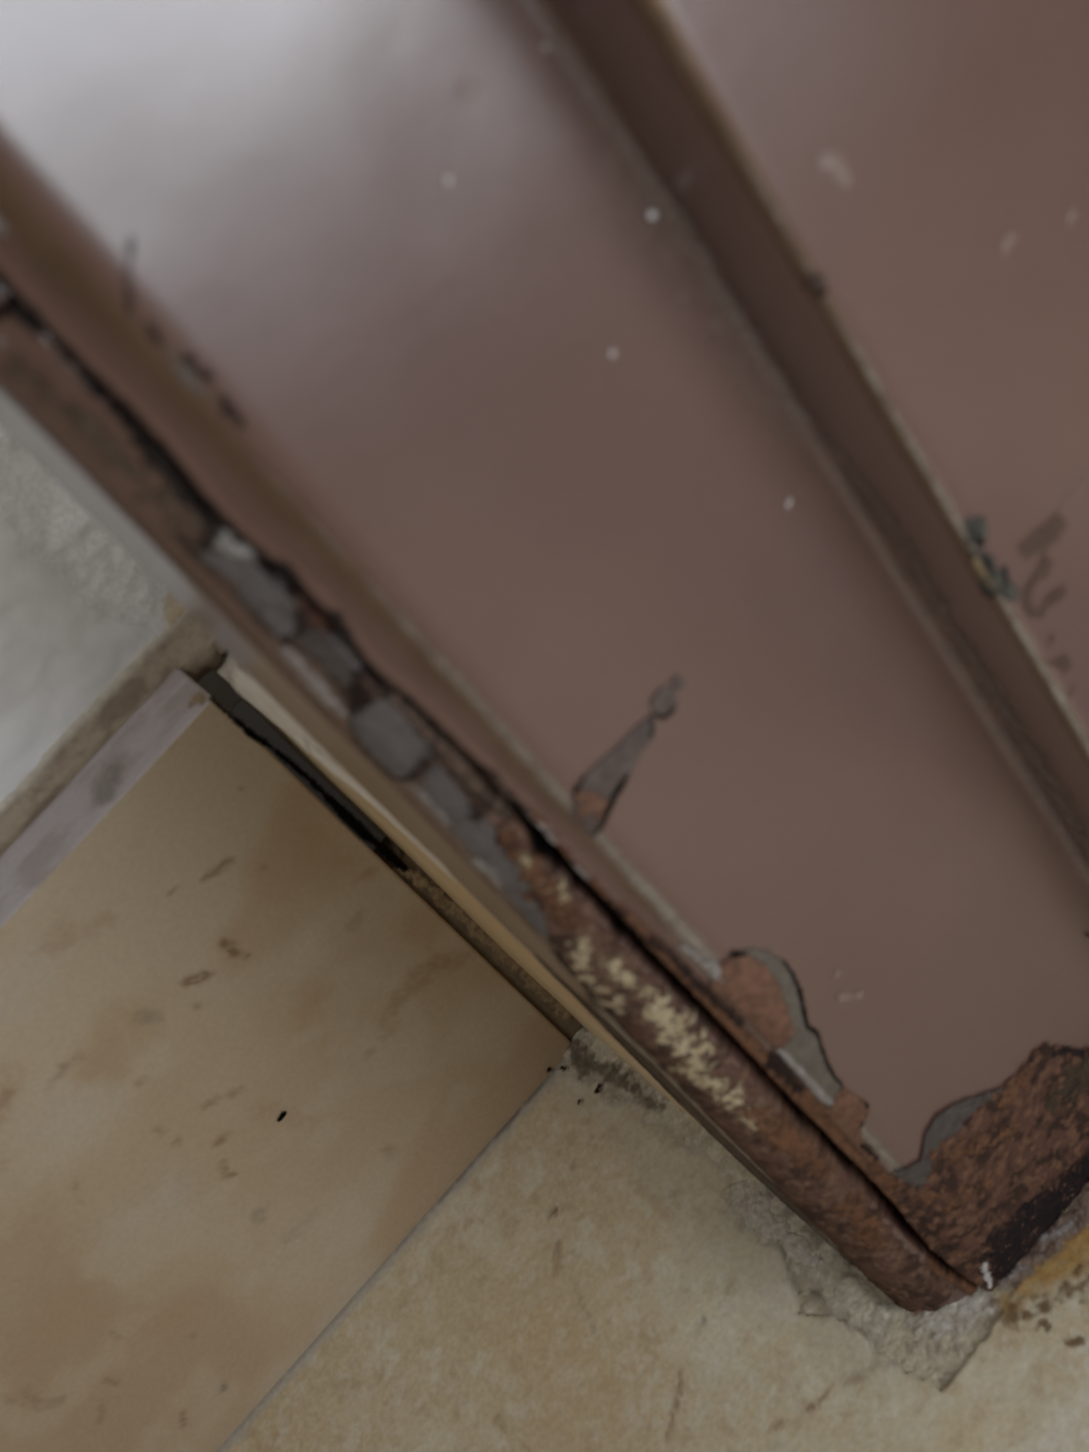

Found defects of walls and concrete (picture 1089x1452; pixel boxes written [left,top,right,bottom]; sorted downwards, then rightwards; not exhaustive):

crack [0,277,463,750]
peeling [174,518,554,946]
crack [517,802,753,1057]
peeling [514,675,903,1171]
corrosion [346,675,1089,1325]
crack [783,1090,948,1267]
peeling [844,330,1089,752]